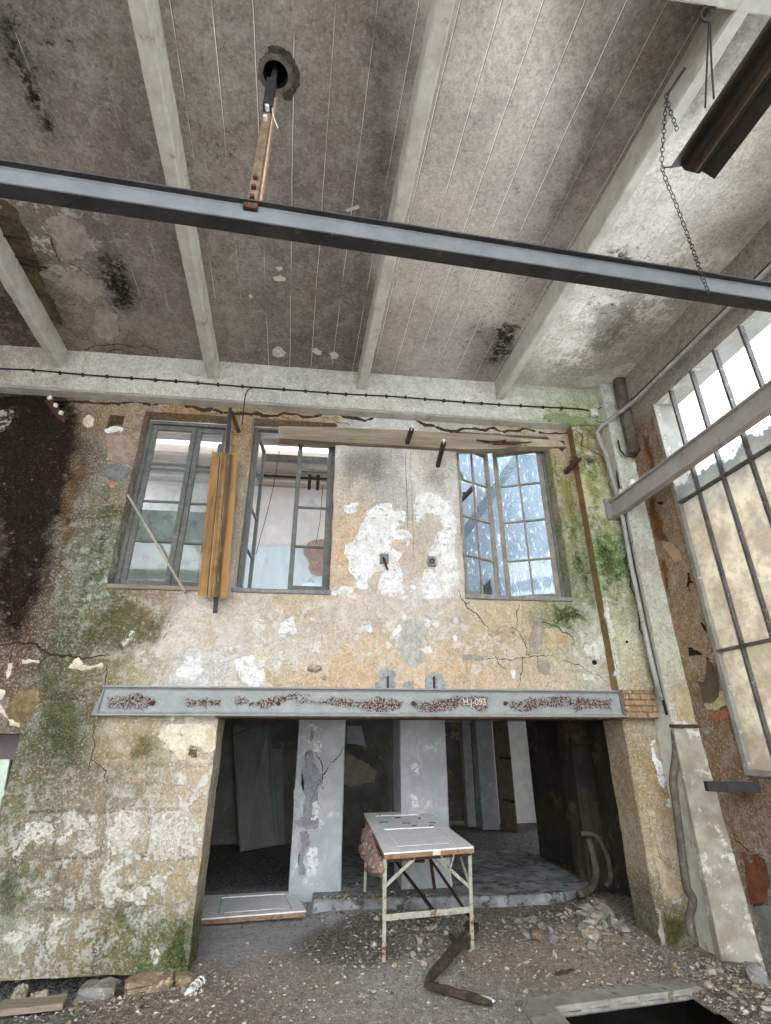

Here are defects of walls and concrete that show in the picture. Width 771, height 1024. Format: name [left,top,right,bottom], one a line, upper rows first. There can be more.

water stain [1,19,55,141]
crack [53,397,374,425]
crack [417,421,613,499]
water stain [0,395,84,636]
peeling [331,492,460,669]
crack [458,590,606,687]
rust [107,693,153,710]
rust [185,697,221,707]
rust [235,692,488,712]
spalling [290,720,324,887]
peeling [741,852,770,907]
water stain [0,916,71,950]